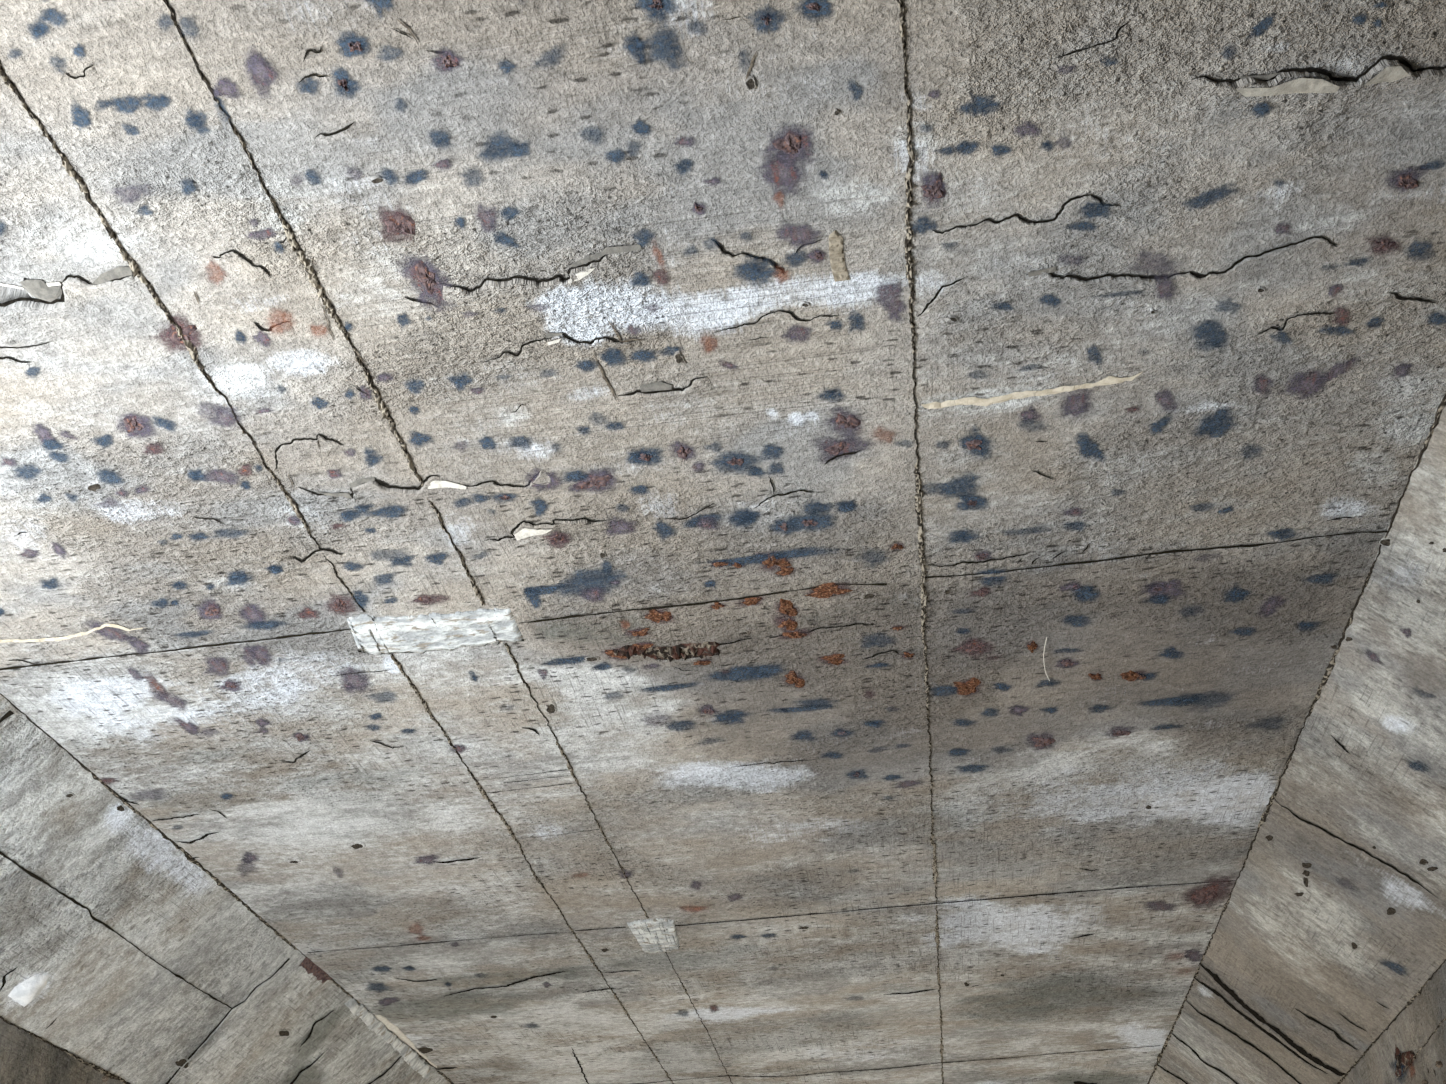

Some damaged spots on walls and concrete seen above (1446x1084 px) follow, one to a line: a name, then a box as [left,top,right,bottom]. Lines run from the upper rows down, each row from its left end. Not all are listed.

crack [1179,55,1446,131]
spalling [0,272,62,302]
damp [630,272,649,286]
damp [735,252,808,285]
crack [917,194,1338,320]
crack [404,245,720,421]
crack [274,434,612,556]
rust [711,552,795,576]
rust [603,609,672,669]
rust [710,582,853,639]
rust [785,670,805,688]
crack [1155,963,1391,1084]